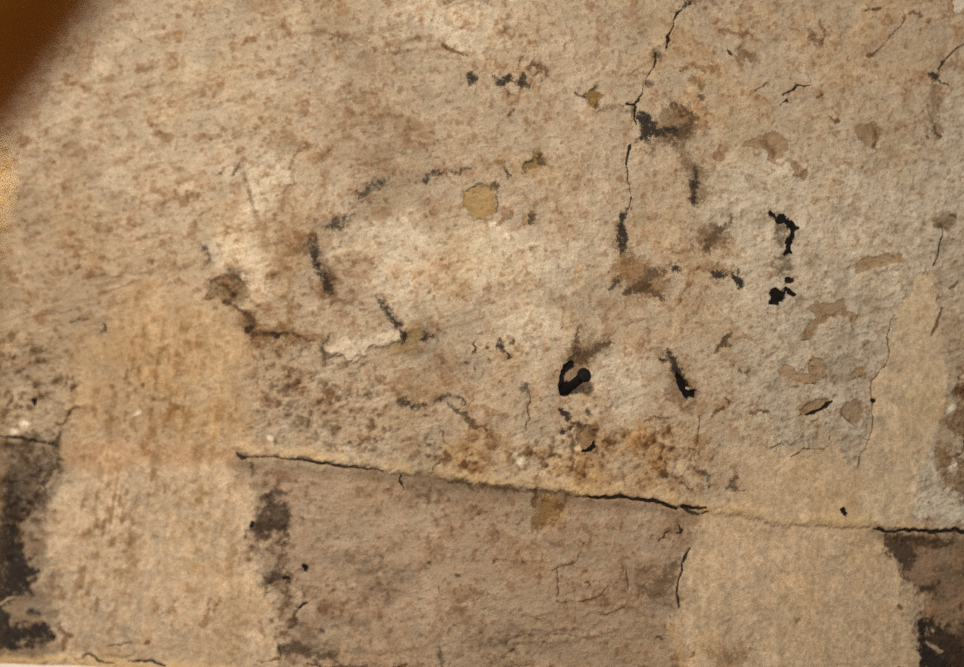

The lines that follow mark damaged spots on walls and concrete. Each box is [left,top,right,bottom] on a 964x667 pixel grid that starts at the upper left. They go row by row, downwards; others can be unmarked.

crack [625,10,682,210]
peeling [768,210,799,256]
peeling [769,276,797,305]
hole [659,348,699,412]
crack [236,453,404,489]
crack [874,527,964,548]
leakage [884,537,940,594]
leakage [58,627,74,651]